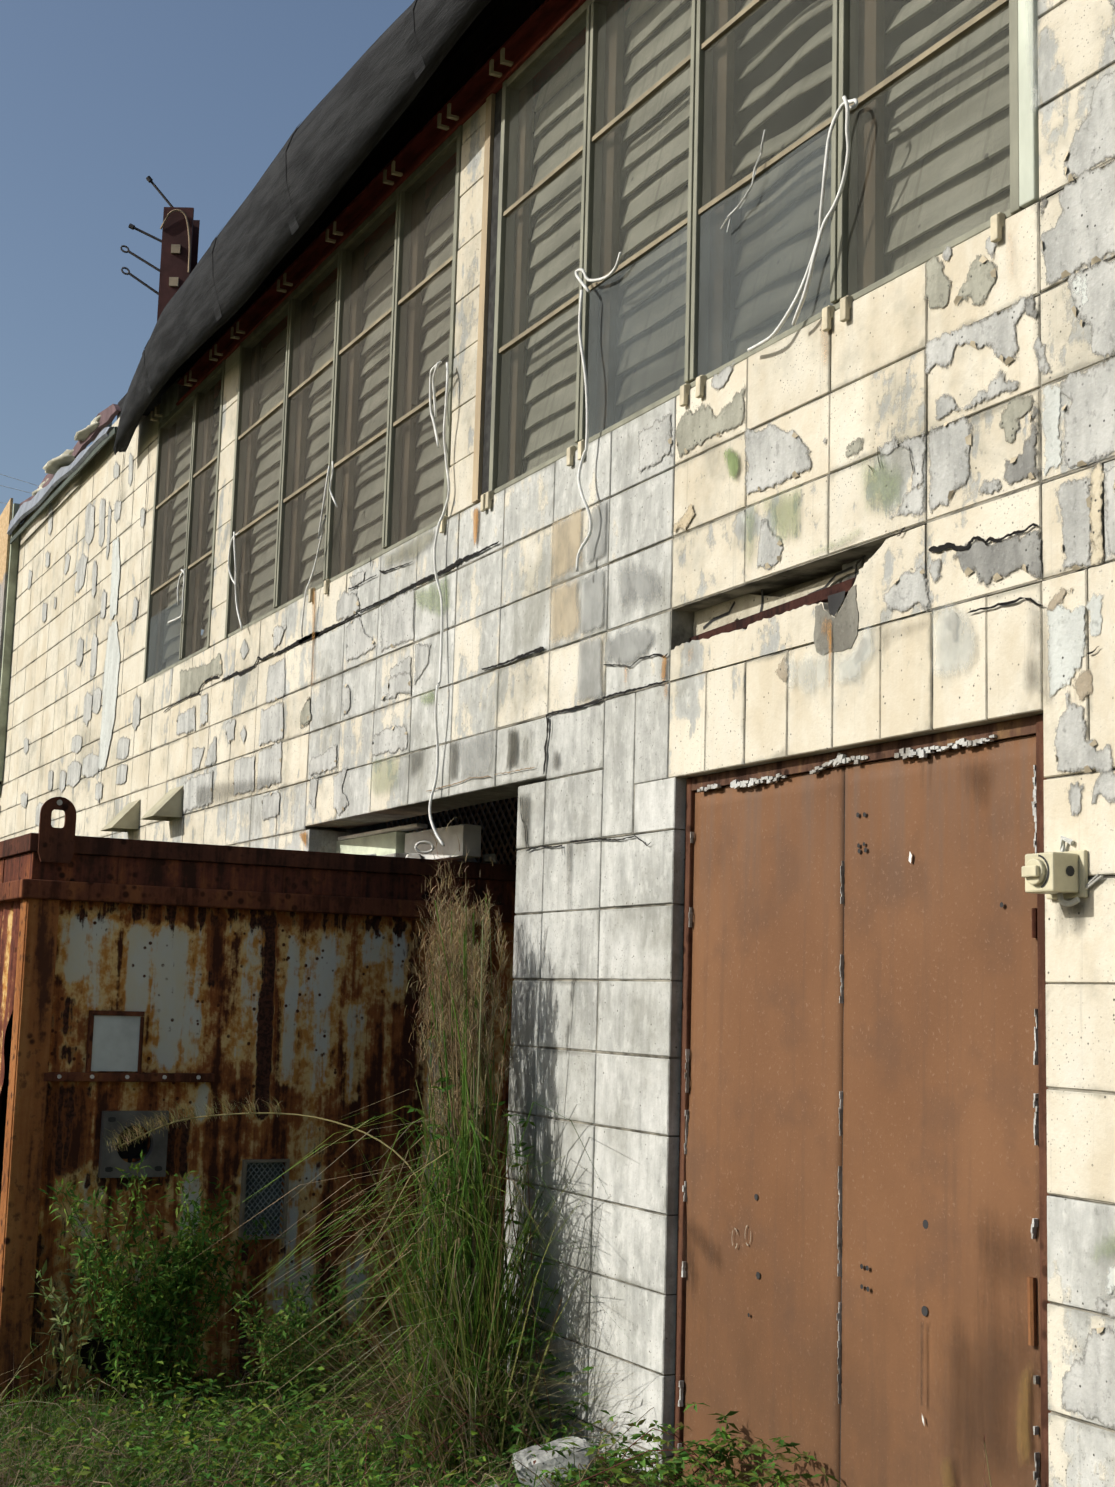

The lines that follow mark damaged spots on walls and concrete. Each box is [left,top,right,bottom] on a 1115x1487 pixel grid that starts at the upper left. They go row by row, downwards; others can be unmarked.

peeling [845,71,1115,571]
peeling [675,361,826,495]
peeling [21,497,140,827]
peeling [176,625,311,814]
peeling [757,519,783,570]
spalling [814,585,859,655]
peeling [883,528,1042,613]
crack [897,523,1038,553]
peeling [1054,690,1115,816]